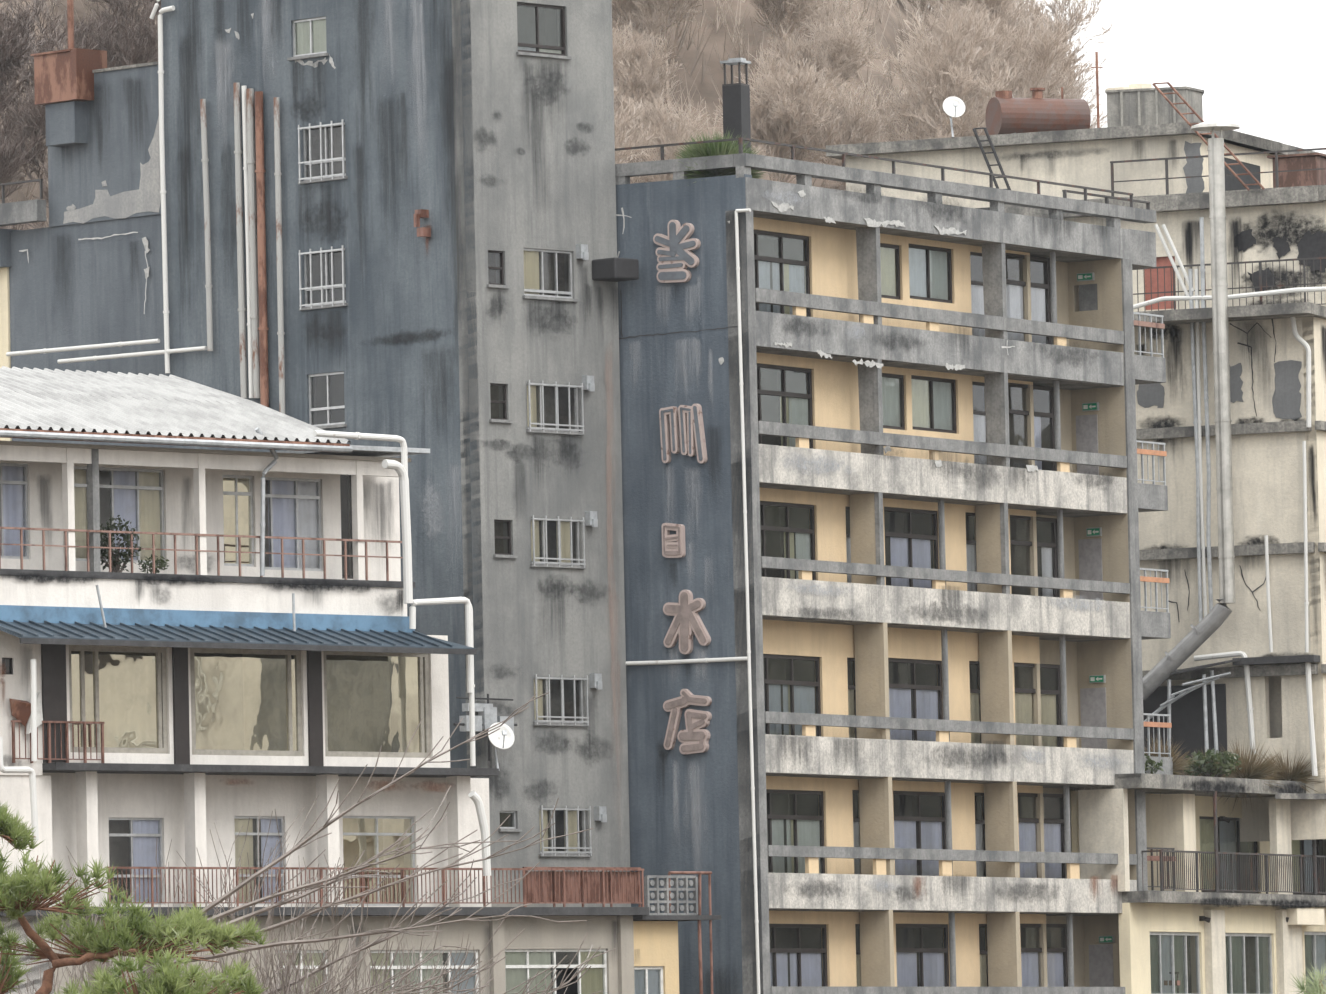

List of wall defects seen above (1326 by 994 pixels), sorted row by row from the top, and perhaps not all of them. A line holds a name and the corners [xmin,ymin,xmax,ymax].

flaking render [63,117,161,224]
peeling [1185,222,1200,268]
peeling [1231,213,1326,298]
damp [1142,418,1180,441]